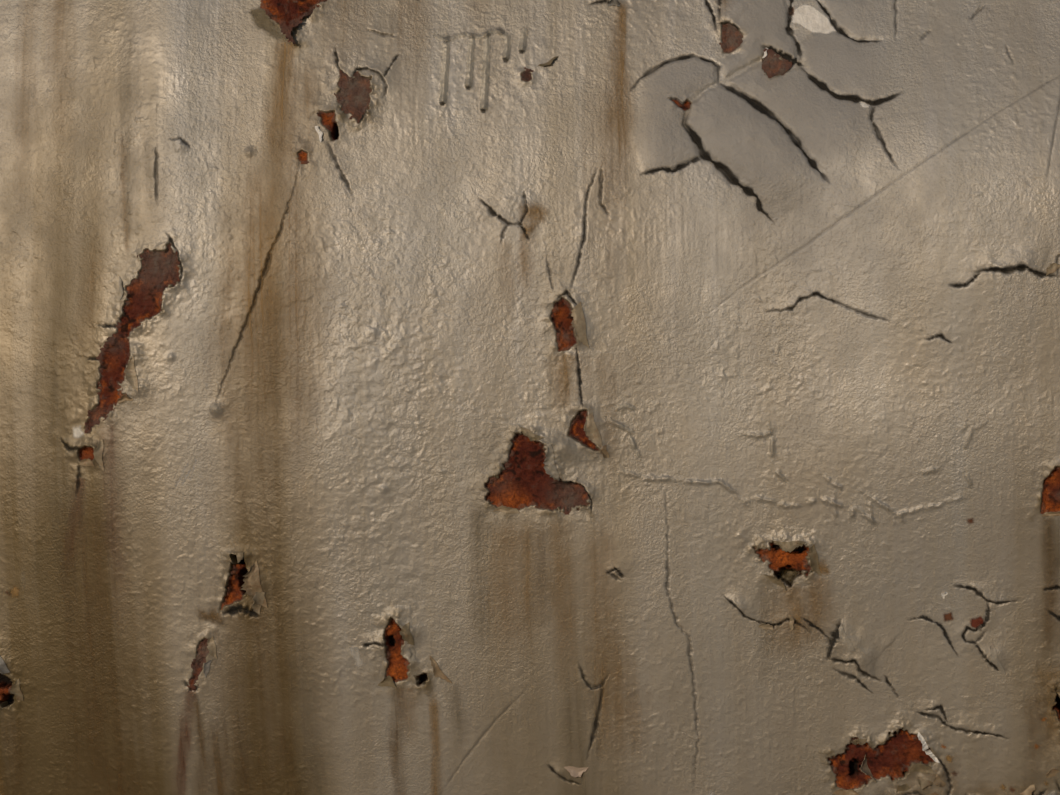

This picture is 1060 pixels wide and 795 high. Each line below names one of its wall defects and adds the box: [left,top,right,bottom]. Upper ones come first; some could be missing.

peeling [791,5,836,34]
peeling [718,21,743,53]
peeling [762,48,792,78]
peeling [672,100,691,111]
crack [482,194,543,239]
crack [952,263,1060,287]
crack [788,292,836,310]
crack [915,585,1010,675]
crack [805,620,897,695]
peeling [0,656,23,704]
crack [919,705,1001,737]
peeling [1052,692,1060,732]